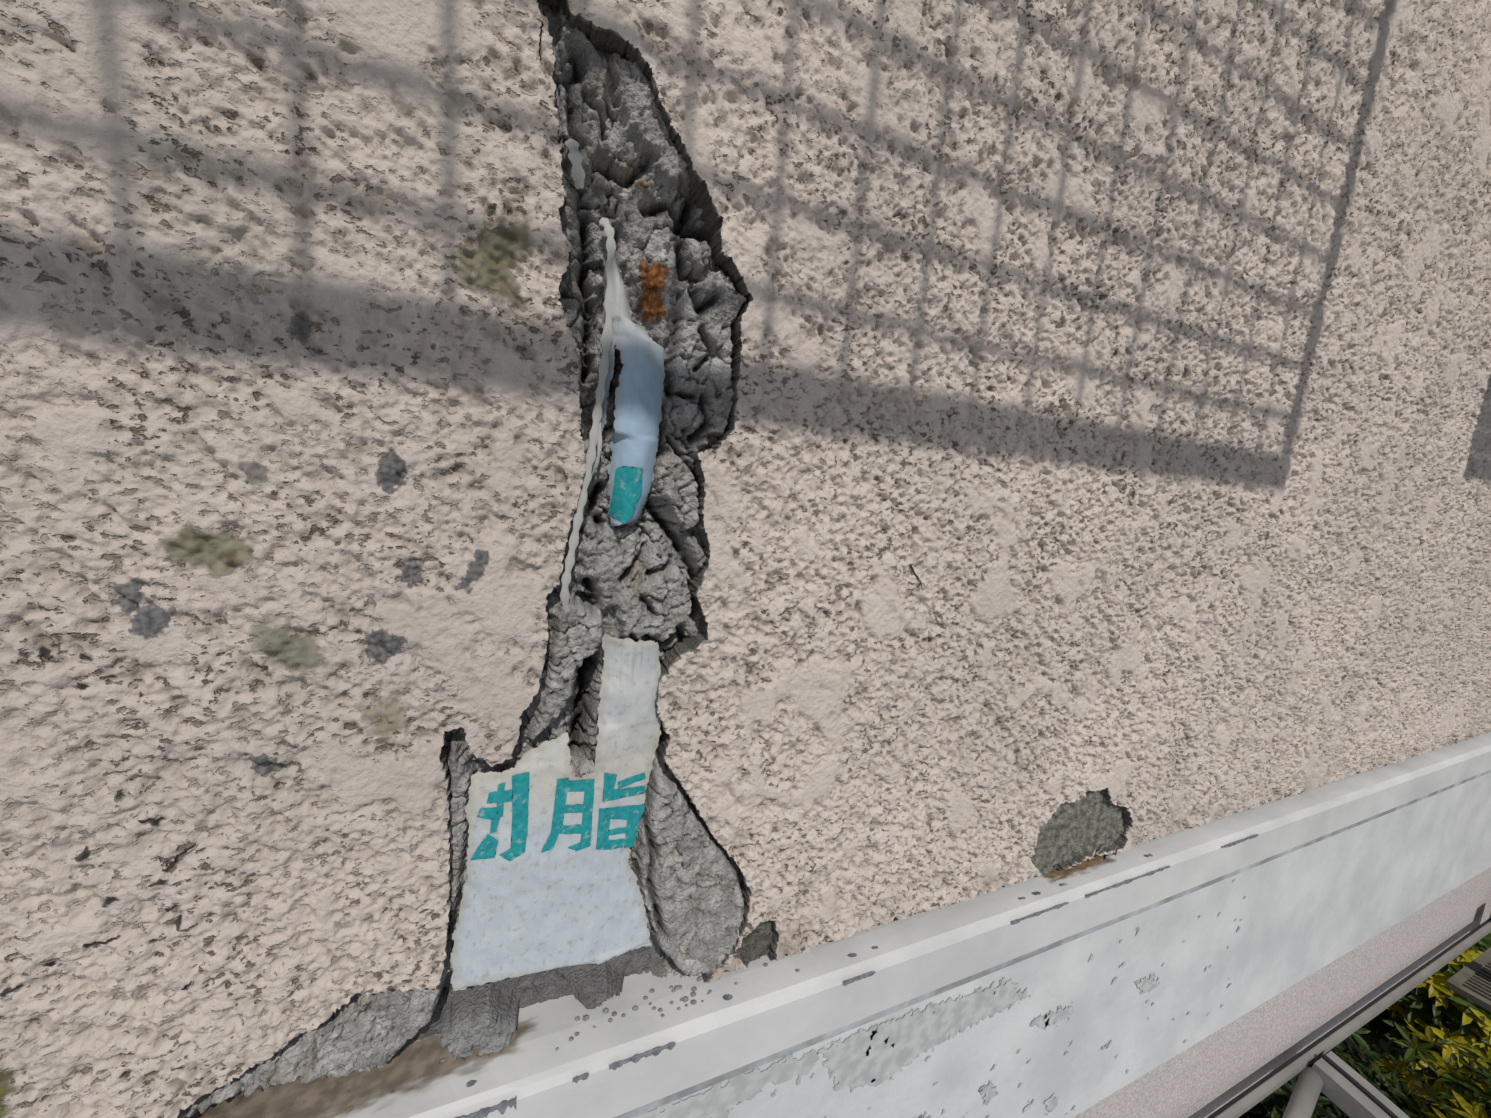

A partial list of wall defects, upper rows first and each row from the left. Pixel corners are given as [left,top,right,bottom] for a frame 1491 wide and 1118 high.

crack [537,21,545,61]
corrosion [634,257,670,324]
flaking render [177,0,779,1118]
flaking render [138,817,166,826]
flaking render [1021,788,1134,899]
peeling [635,977,1031,1118]
peeling [1030,1002,1074,1030]
peeling [1112,962,1164,1020]